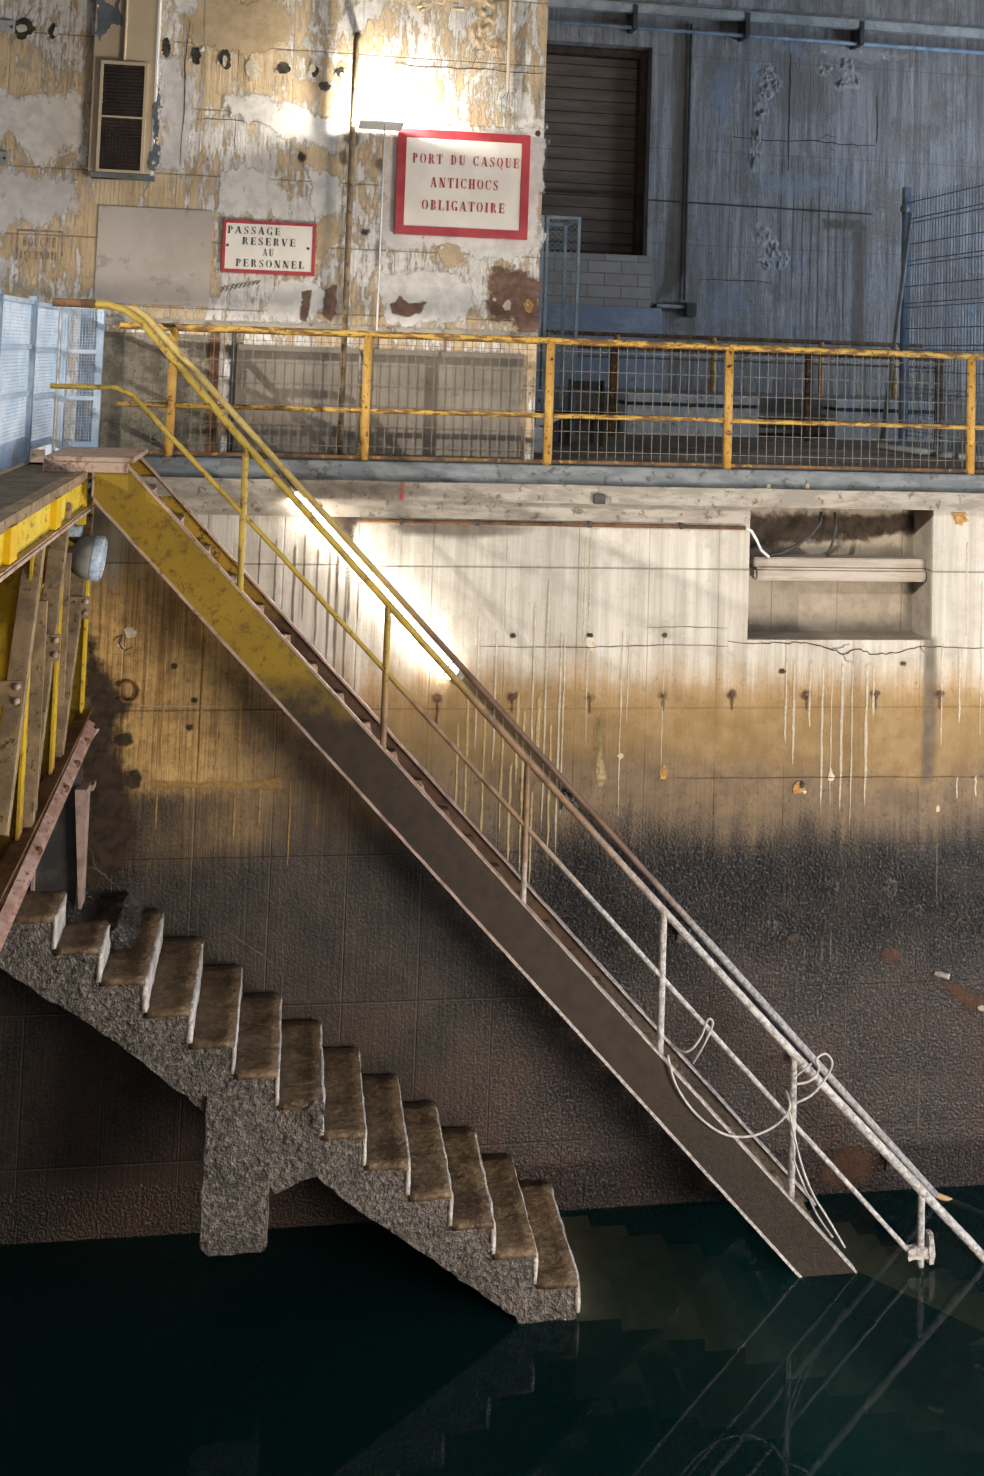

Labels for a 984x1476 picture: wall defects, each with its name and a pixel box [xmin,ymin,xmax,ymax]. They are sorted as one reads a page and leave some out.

spalling [11,18,60,40]
peeling [0,85,90,236]
peeling [147,37,347,225]
peeling [375,116,548,263]
peeling [259,276,325,324]
corrosion [390,296,426,317]
peeling [373,268,478,328]
damp [82,616,291,885]
damp [455,521,629,883]
crack [482,626,979,661]
efflorescence [784,661,875,819]
damp [923,640,961,781]